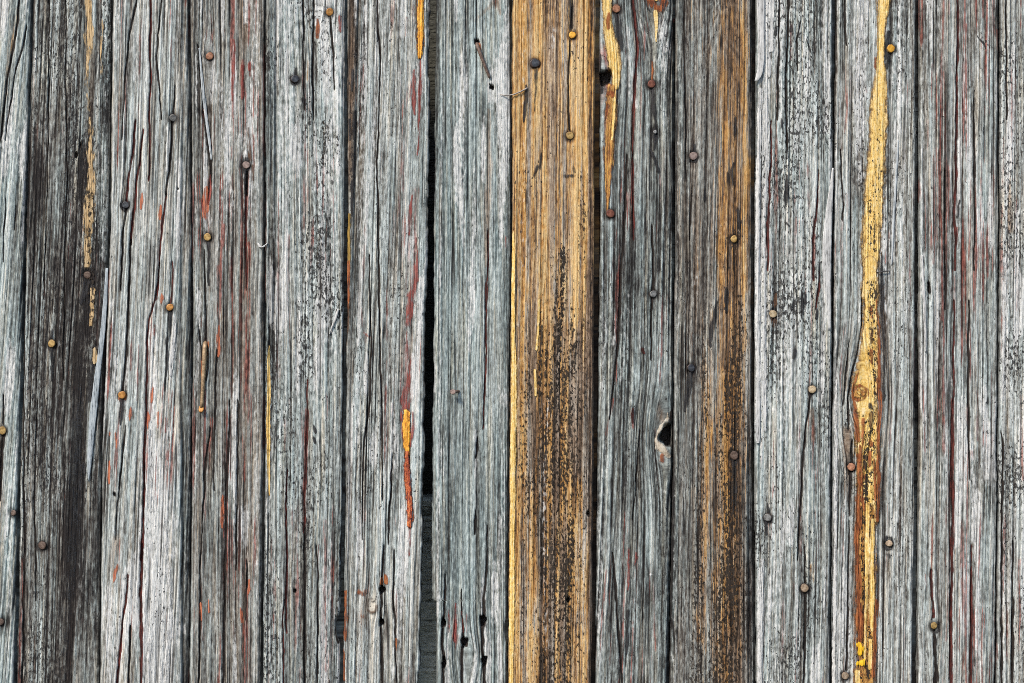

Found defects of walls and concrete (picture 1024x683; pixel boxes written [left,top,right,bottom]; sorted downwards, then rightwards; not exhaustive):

crack [115,0,212,683]
peeling [508,231,518,683]
peeling [601,0,622,211]
peeling [851,0,891,683]